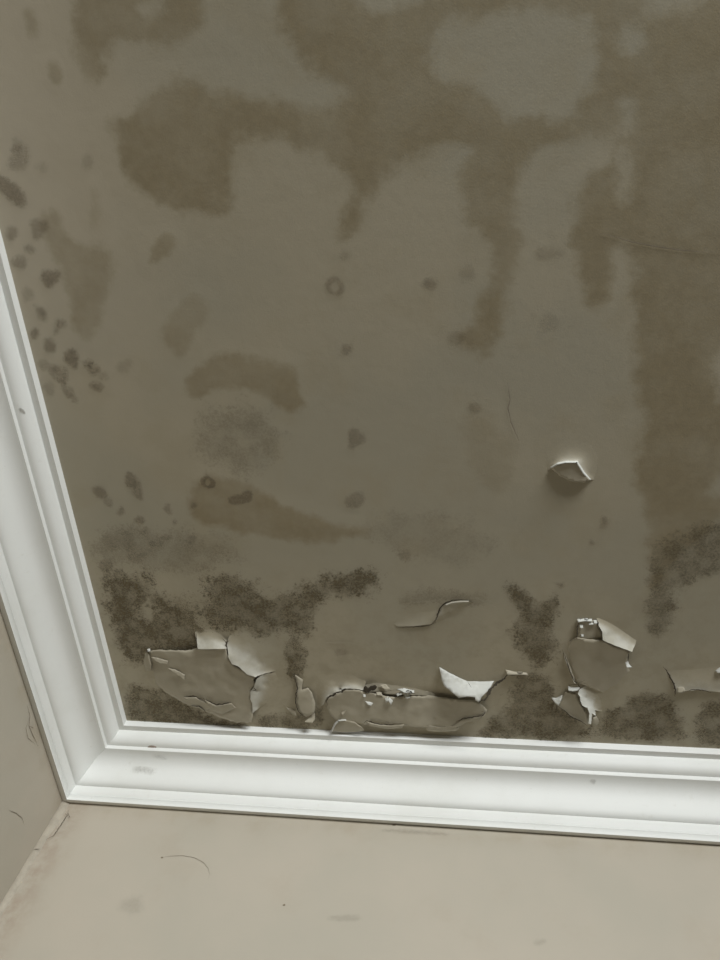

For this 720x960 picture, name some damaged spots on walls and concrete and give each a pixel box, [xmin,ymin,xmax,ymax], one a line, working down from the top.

damp [9,0,720,633]
peeling [546,440,598,483]
damp [126,684,239,726]
peeling [143,630,280,723]
mould [101,568,379,678]
peeling [285,667,528,732]
damp [481,584,684,741]
peeling [551,618,636,726]